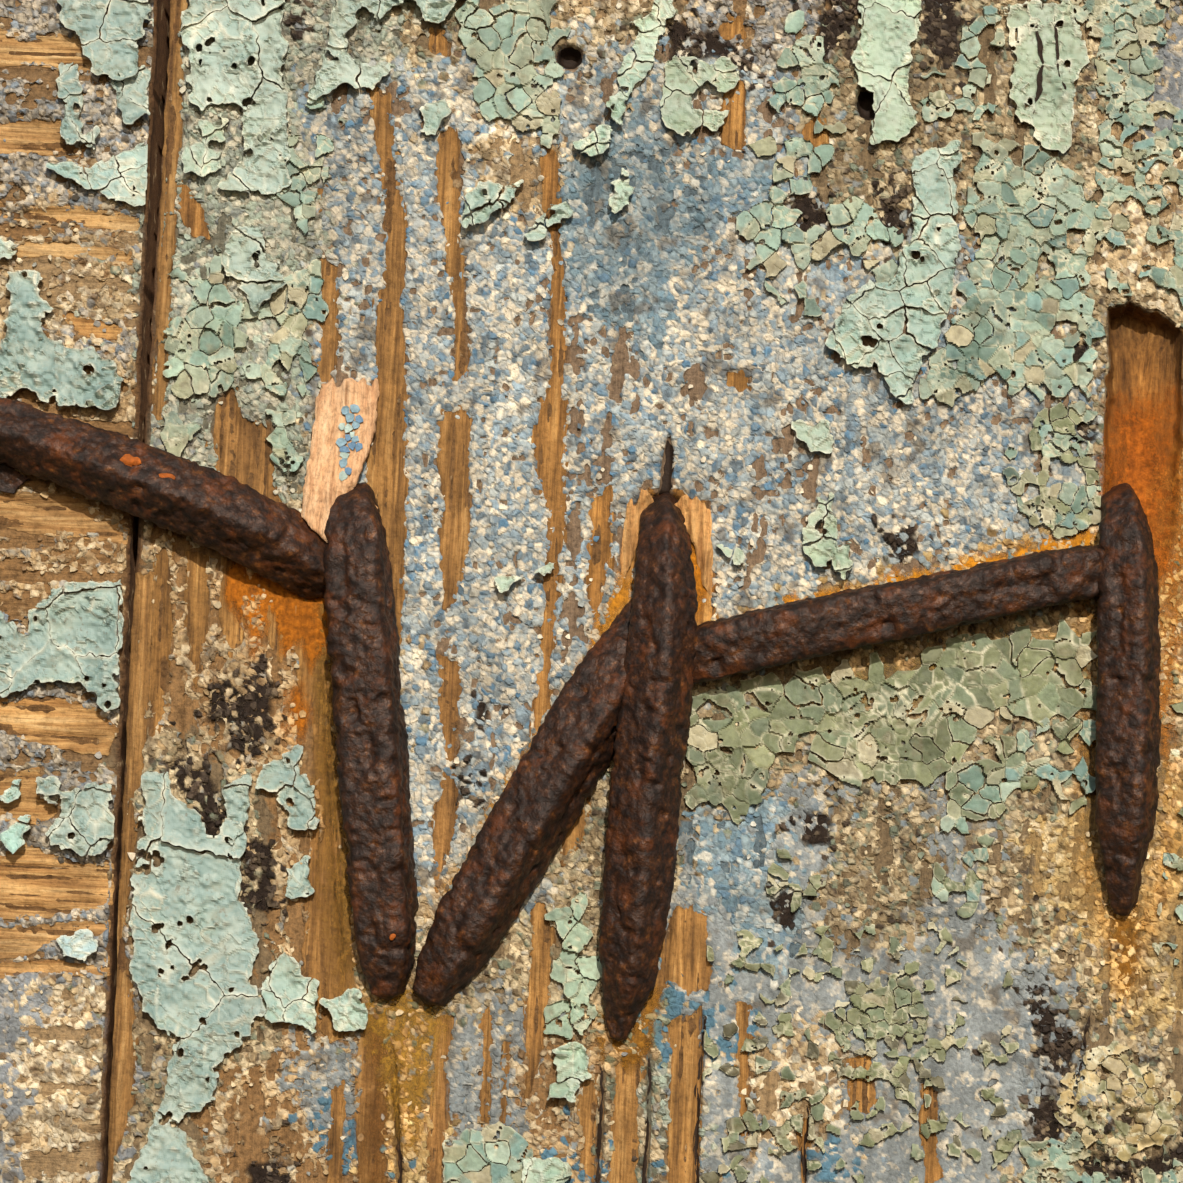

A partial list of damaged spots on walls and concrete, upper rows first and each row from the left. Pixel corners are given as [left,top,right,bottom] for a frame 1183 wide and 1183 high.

peeling [851,0,922,145]
peeling [1003,0,1090,154]
peeling [0,0,292,425]
peeling [307,0,457,645]
peeling [825,140,963,405]
rust [120,454,141,467]
rust [590,576,630,649]
rust [690,546,707,612]
rust [871,531,1094,585]
rust [1100,400,1183,757]
peeling [0,540,389,1183]
rust [596,987,659,1070]